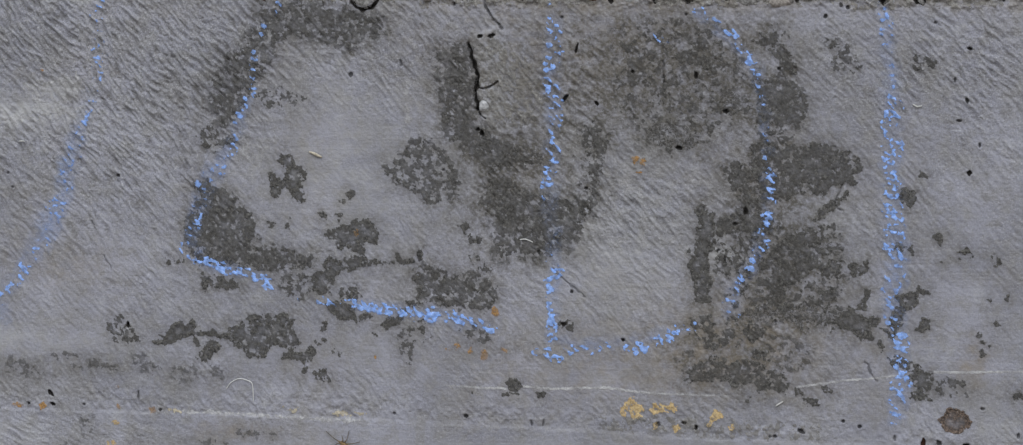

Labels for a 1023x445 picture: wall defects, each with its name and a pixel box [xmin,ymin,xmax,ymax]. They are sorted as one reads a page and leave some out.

damp [196,0,389,152]
crack [468,43,480,110]
damp [106,43,611,382]
damp [613,19,968,407]
corrosion [937,407,973,434]